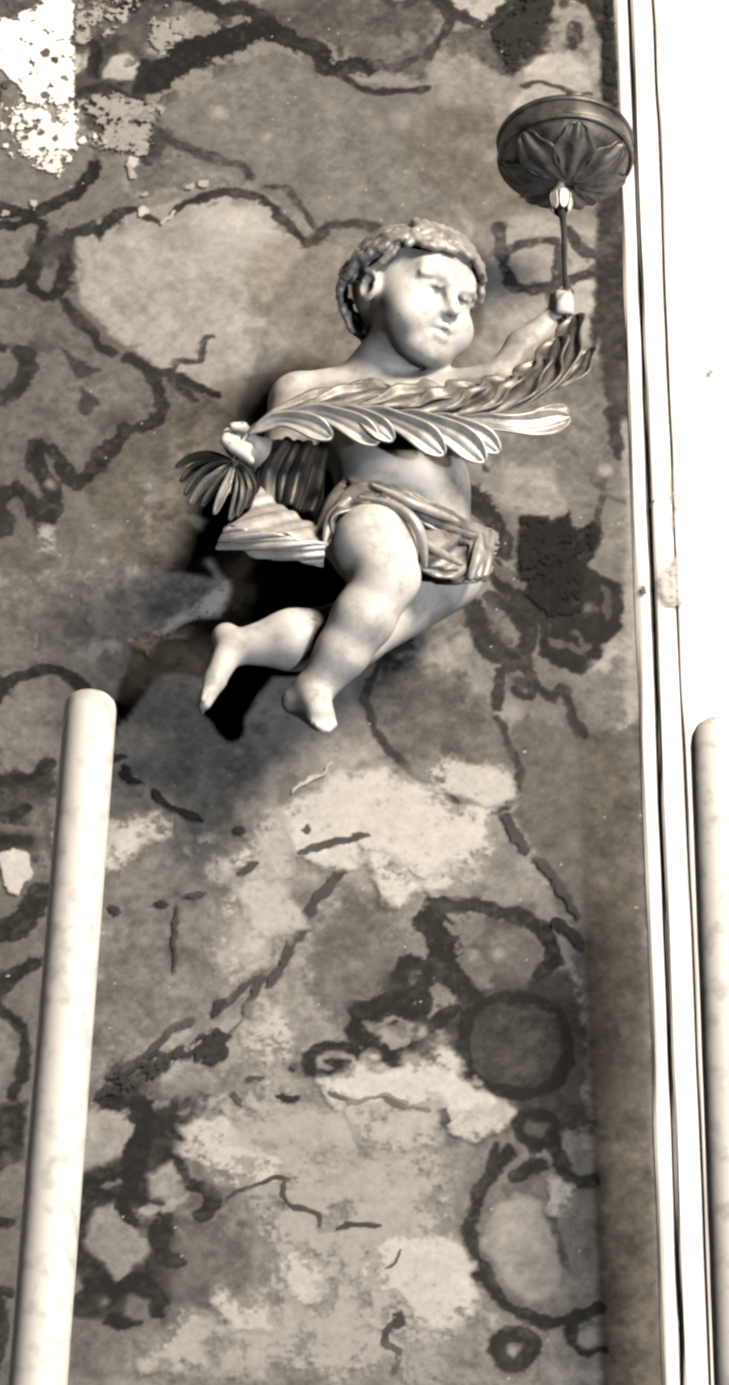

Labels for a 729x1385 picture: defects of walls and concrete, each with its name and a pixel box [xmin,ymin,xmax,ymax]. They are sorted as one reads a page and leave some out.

peeling [148,5,188,56]
peeling [0,0,176,224]
peeling [184,180,209,189]